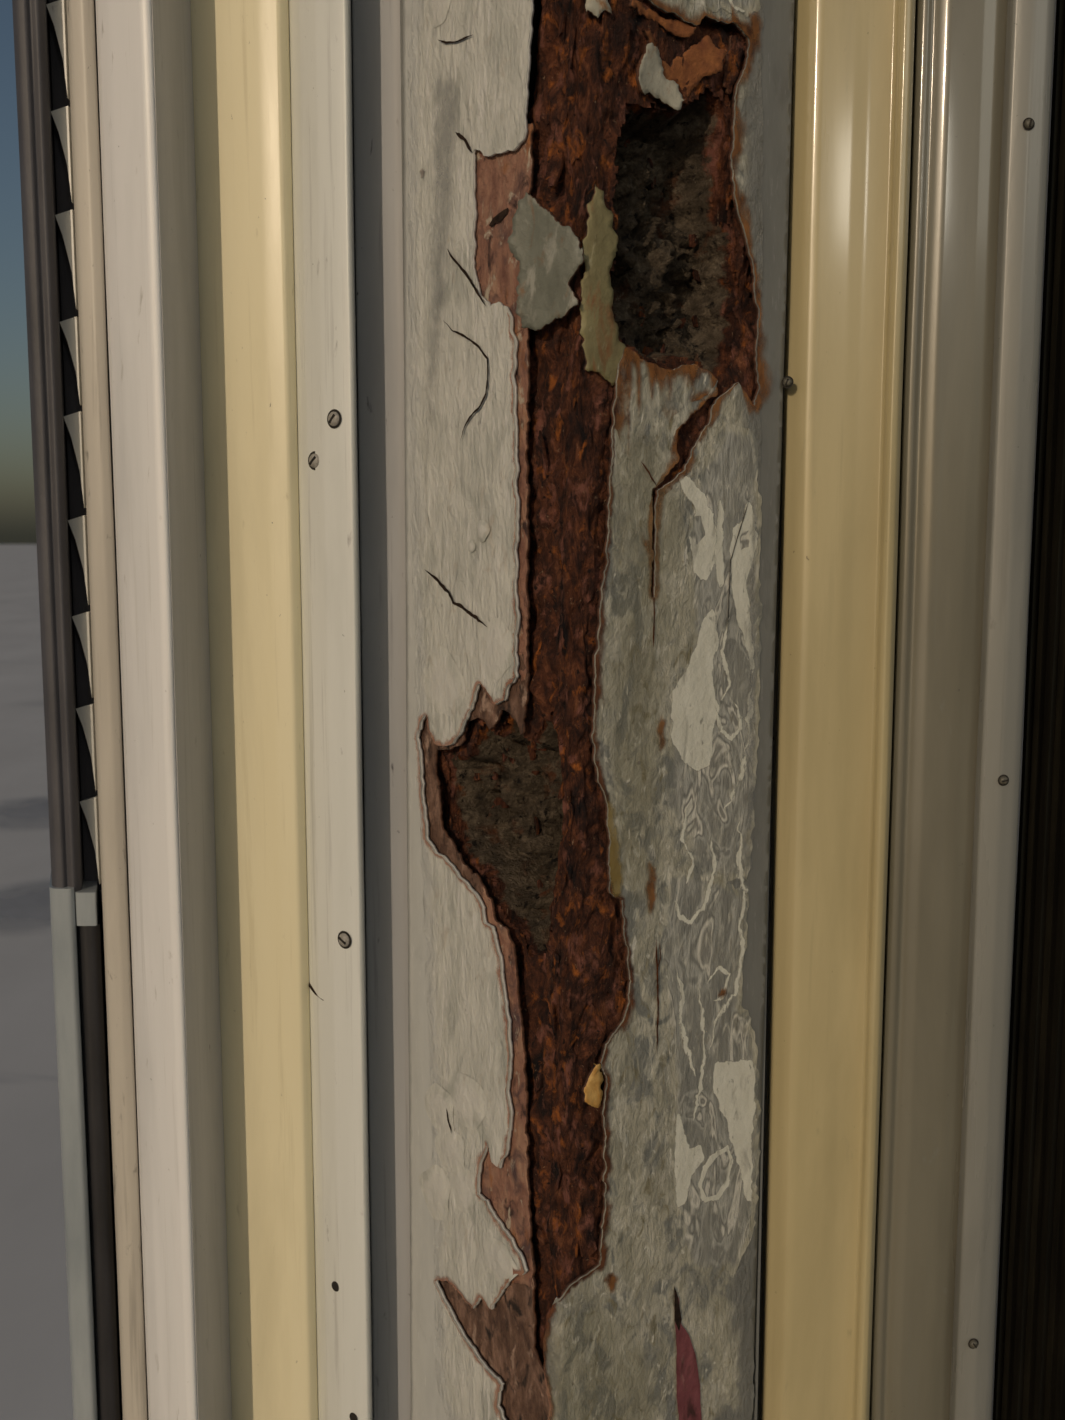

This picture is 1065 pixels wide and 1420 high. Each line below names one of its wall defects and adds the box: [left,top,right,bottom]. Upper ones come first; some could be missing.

peeling [688,0,761,17]
peeling [635,43,684,111]
crack [447,249,485,305]
crack [444,322,488,440]
crack [425,570,487,627]
crack [650,599,658,647]
corrosion [414,0,769,1420]
peeling [420,123,550,1420]
peeling [660,424,763,1279]
peeling [674,1286,702,1420]